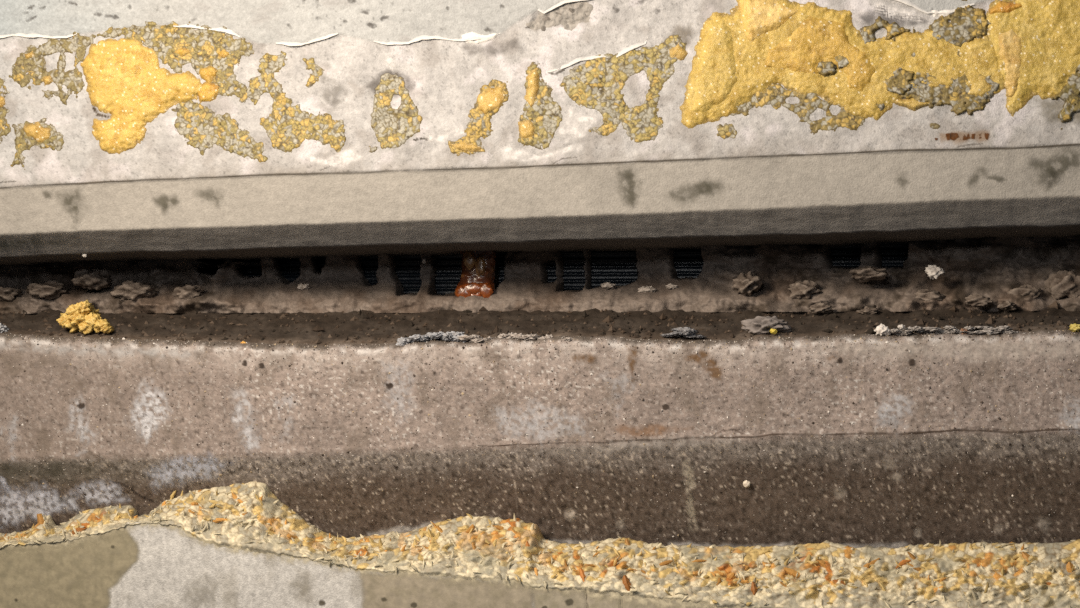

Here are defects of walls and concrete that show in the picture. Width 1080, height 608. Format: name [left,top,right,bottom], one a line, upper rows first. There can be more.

peeling [0,12,509,170]
peeling [498,34,688,161]
peeling [716,84,865,139]
peeling [816,55,849,77]
peeling [860,0,1000,116]
peeling [1051,64,1080,130]
water stain [0,477,124,528]
spalling [0,481,1080,608]